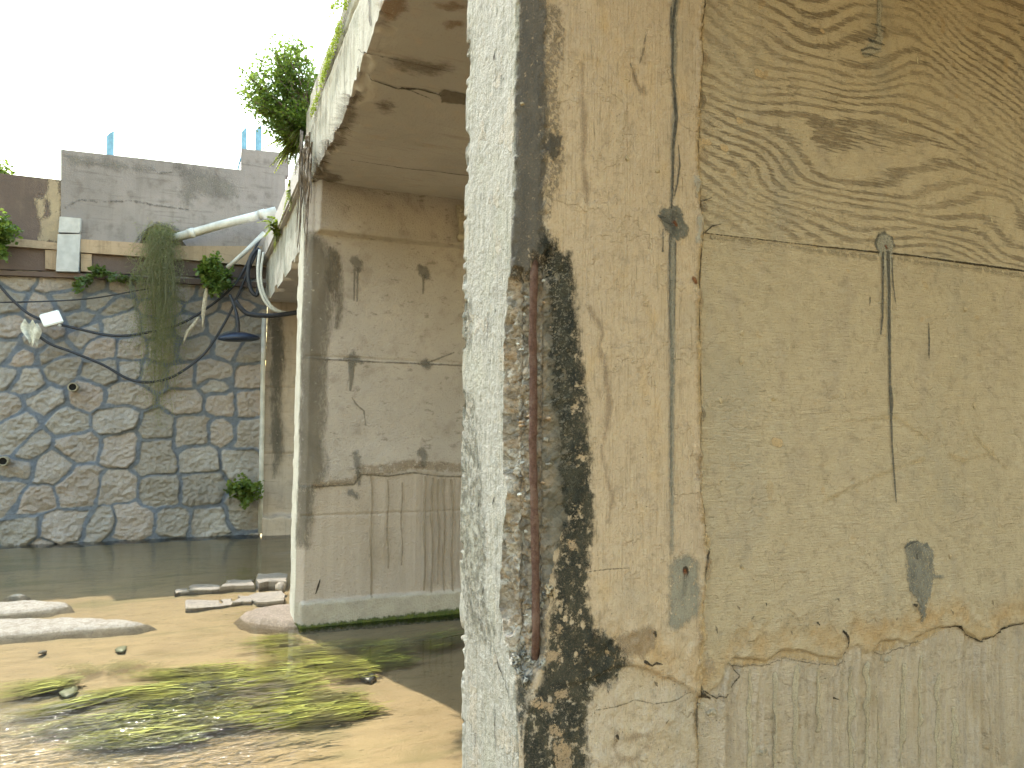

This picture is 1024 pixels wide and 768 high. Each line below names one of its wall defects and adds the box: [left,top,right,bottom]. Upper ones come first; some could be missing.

crack [359,50,441,97]
water stain [296,233,363,546]
spalling [478,247,576,686]
water stain [510,0,630,768]
water stain [658,0,701,629]
crack [598,0,1024,757]
water stain [869,231,897,503]
water stain [905,541,943,624]